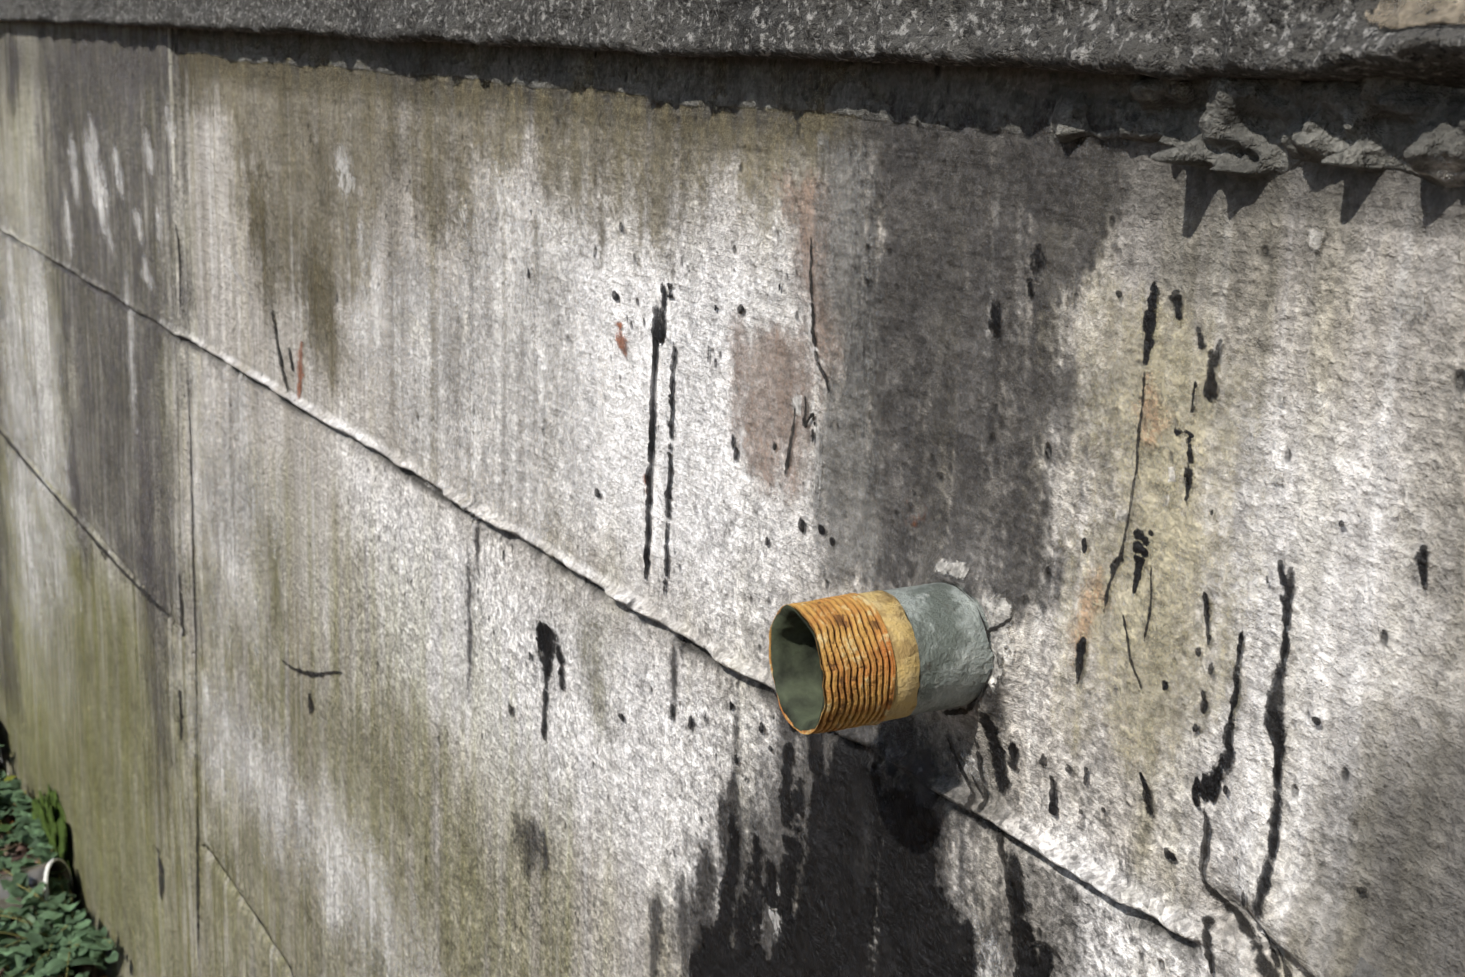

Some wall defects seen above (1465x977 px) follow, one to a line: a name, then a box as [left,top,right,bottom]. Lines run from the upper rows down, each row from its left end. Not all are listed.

leakage [0,23,392,977]
leakage [643,282,676,596]
leakage [731,94,1244,816]
leakage [649,638,1054,977]
leakage [1163,847,1177,861]
crack [1199,809,1292,977]
leakage [1241,559,1295,918]